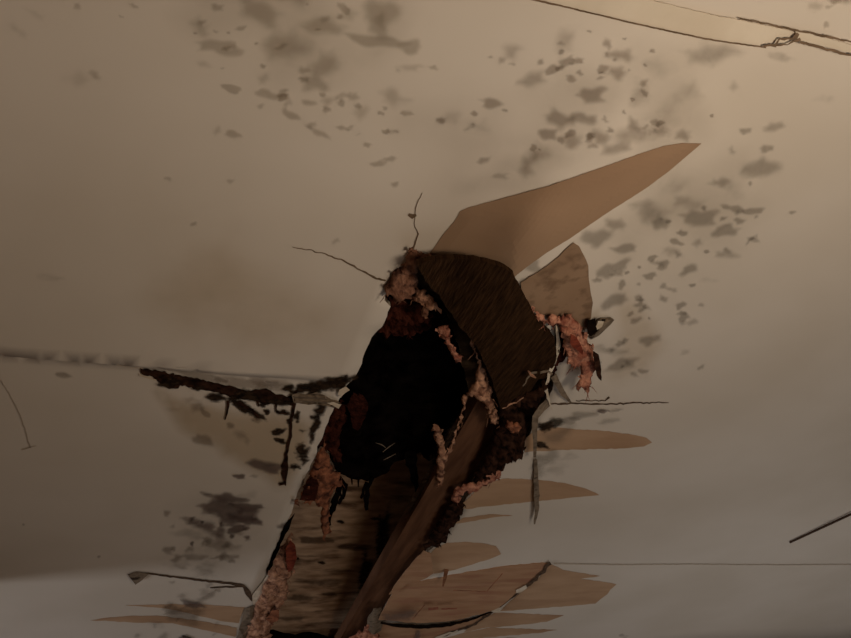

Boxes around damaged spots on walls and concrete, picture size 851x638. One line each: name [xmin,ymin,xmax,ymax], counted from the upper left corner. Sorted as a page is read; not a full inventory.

crack [533,0,851,56]
peeling [429,143,701,276]
leakage [189,494,262,538]